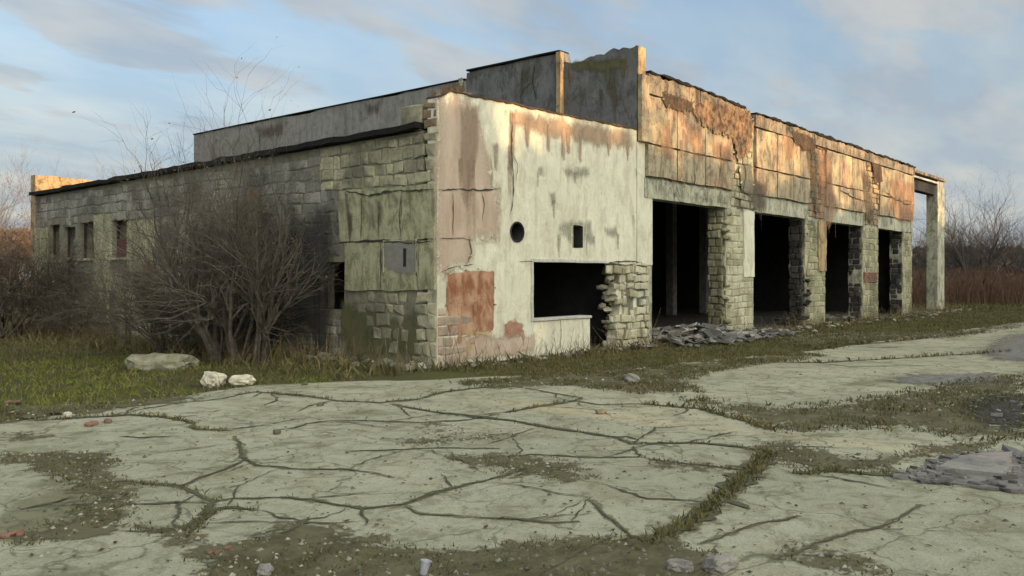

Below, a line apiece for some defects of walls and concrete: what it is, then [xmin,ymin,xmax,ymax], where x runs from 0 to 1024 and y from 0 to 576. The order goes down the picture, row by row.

crack [343,62,537,288]
flaking render [429,77,501,275]
corrosion [510,109,630,162]
spalling [662,91,755,194]
spalling [789,126,817,153]
corrosion [816,152,834,225]
spalling [605,262,650,345]
flaking render [453,335,535,362]
crack [20,386,890,576]
crack [772,504,924,560]